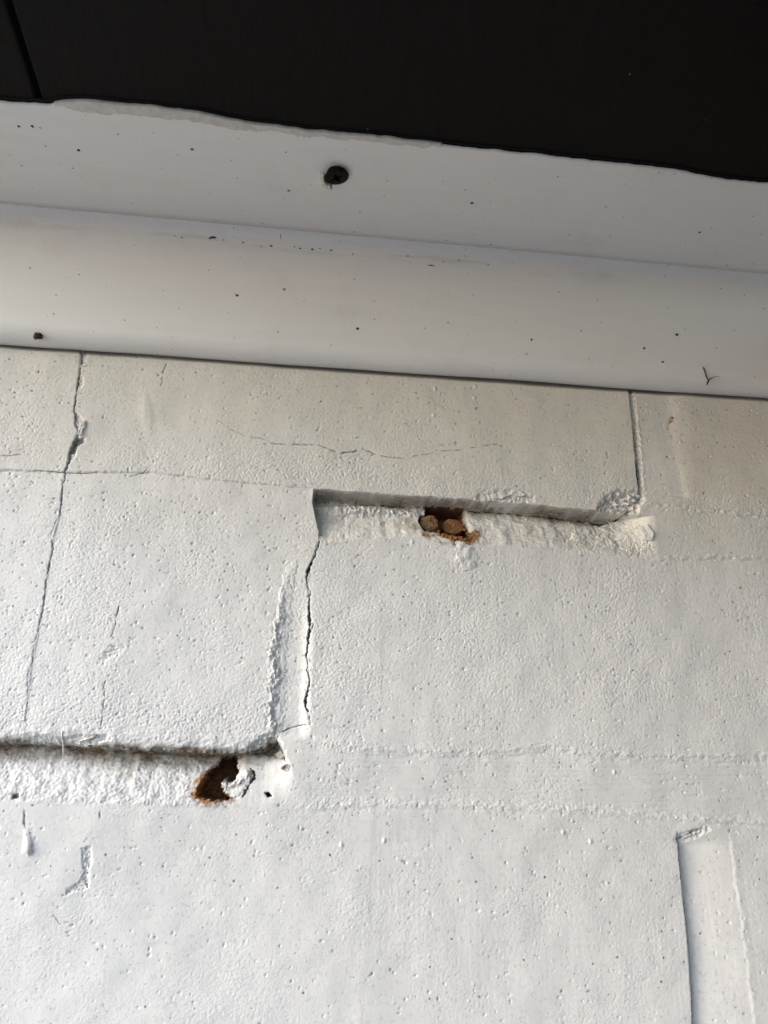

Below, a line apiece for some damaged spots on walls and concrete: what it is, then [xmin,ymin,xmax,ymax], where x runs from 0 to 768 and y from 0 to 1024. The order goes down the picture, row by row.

crack [0,350,98,720]
corrosion [422,530,481,545]
crack [275,541,320,761]
spalling [247,733,291,772]
spalling [193,776,232,802]